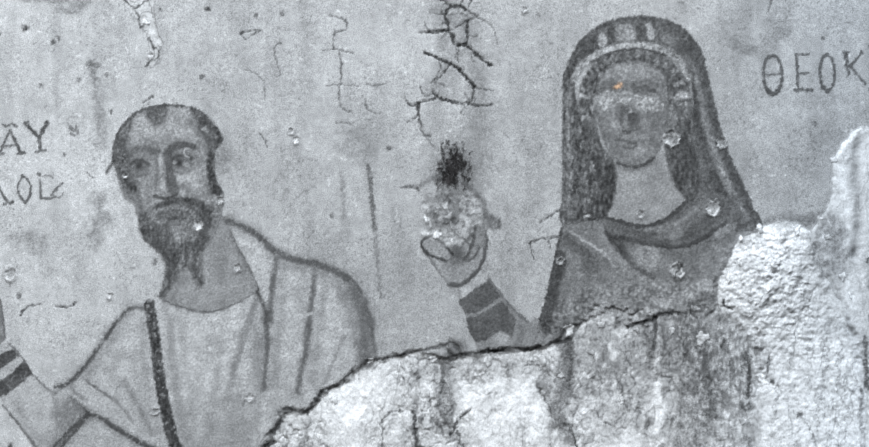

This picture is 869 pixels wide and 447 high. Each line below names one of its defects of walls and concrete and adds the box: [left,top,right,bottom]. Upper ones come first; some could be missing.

crack [406,0,493,144]
peeling [663,132,680,147]
spalling [420,190,484,245]
peeling [707,201,719,216]
peeling [670,262,685,278]
spalling [811,127,869,447]
spalling [265,304,758,447]